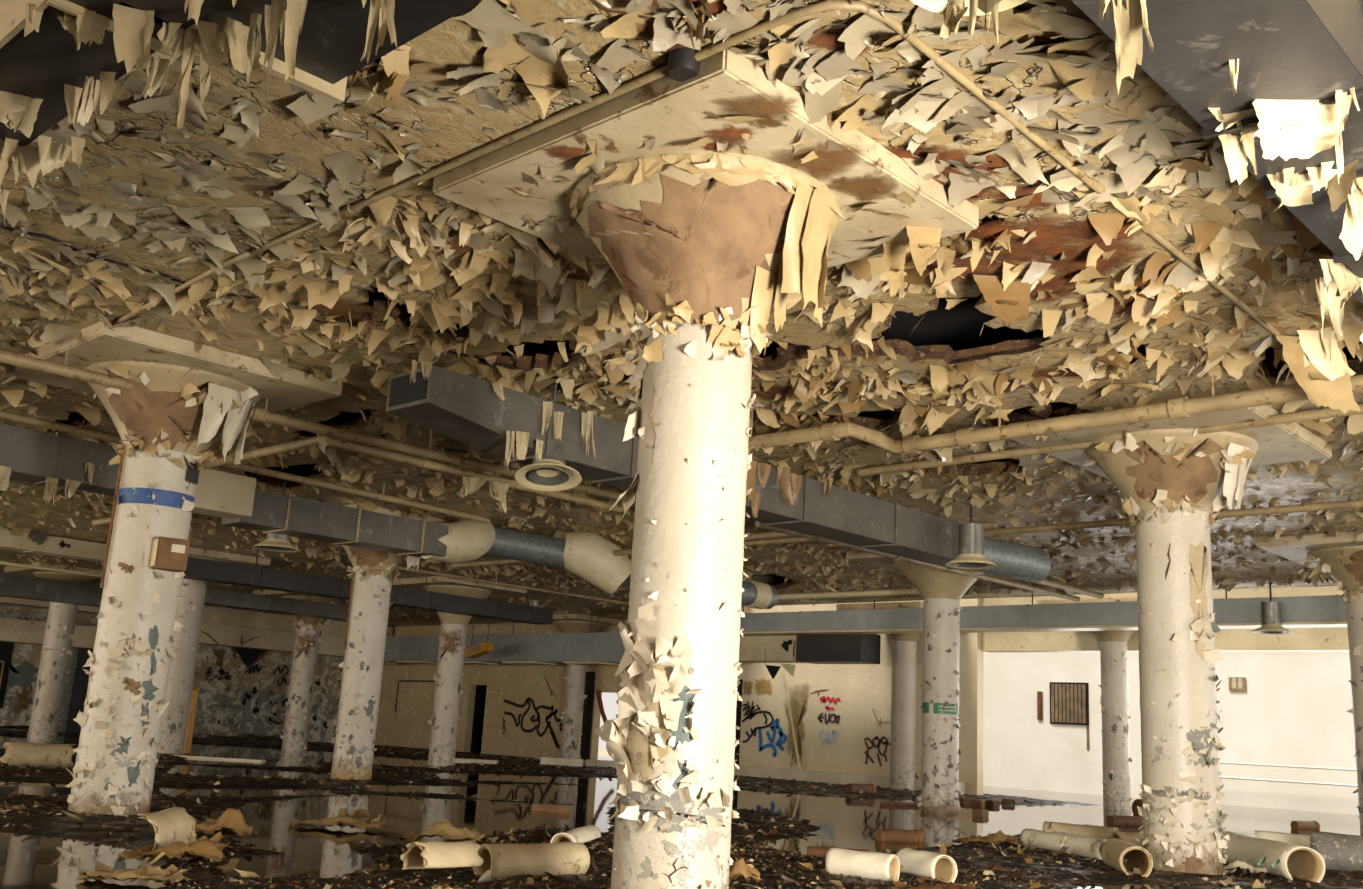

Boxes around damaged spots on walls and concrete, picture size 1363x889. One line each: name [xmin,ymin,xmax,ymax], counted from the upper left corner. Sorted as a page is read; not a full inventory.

leakage [720,96,795,124]
leakage [778,147,893,201]
peeling [0,0,1363,691]
peeling [0,552,276,816]
peeling [181,486,741,834]
peeling [916,670,963,807]
peeling [1098,649,1132,762]
peeling [1102,700,1230,873]